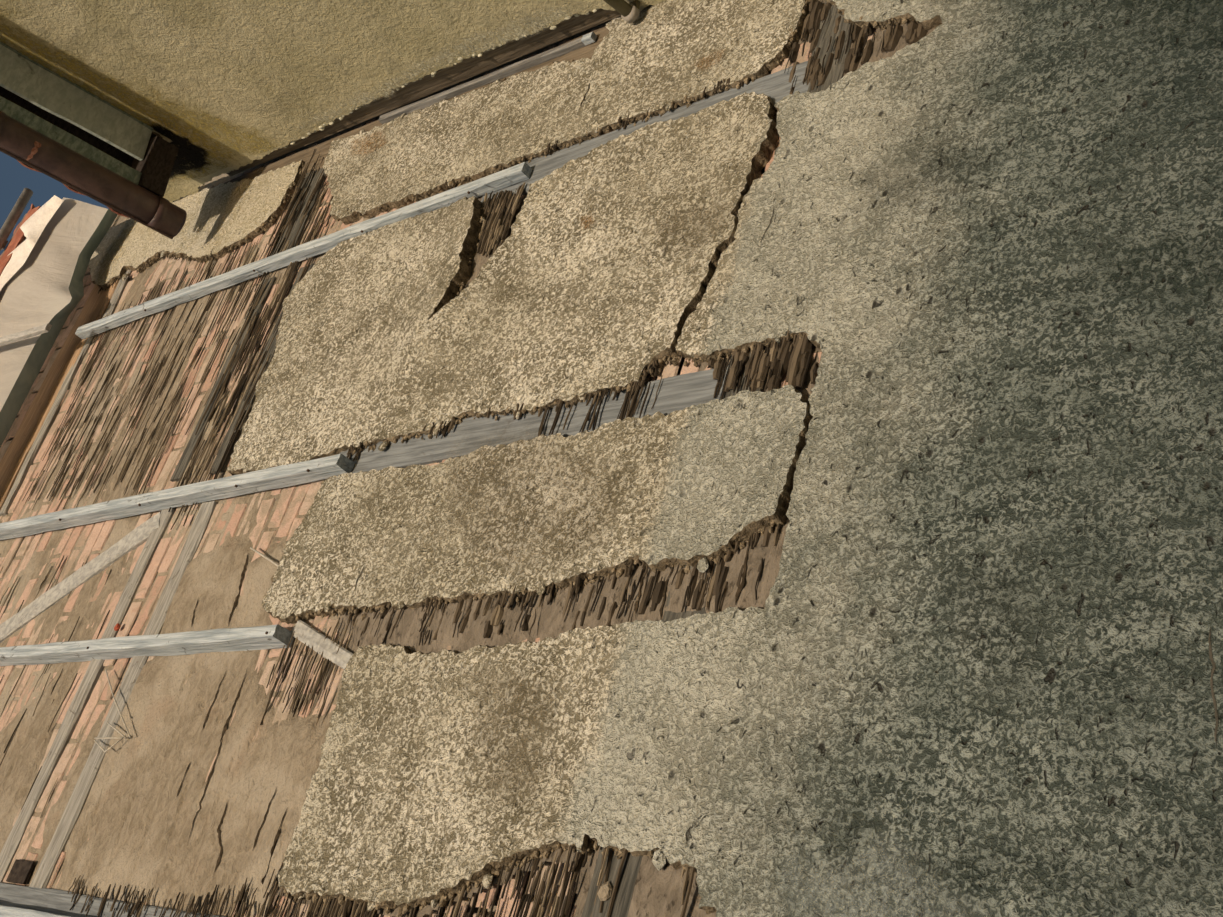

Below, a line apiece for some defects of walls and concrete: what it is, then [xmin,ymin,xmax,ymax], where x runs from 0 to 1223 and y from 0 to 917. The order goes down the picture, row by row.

damp [0,25,271,178]
spalling [0,77,822,523]
spalling [777,0,935,95]
spalling [0,484,789,917]